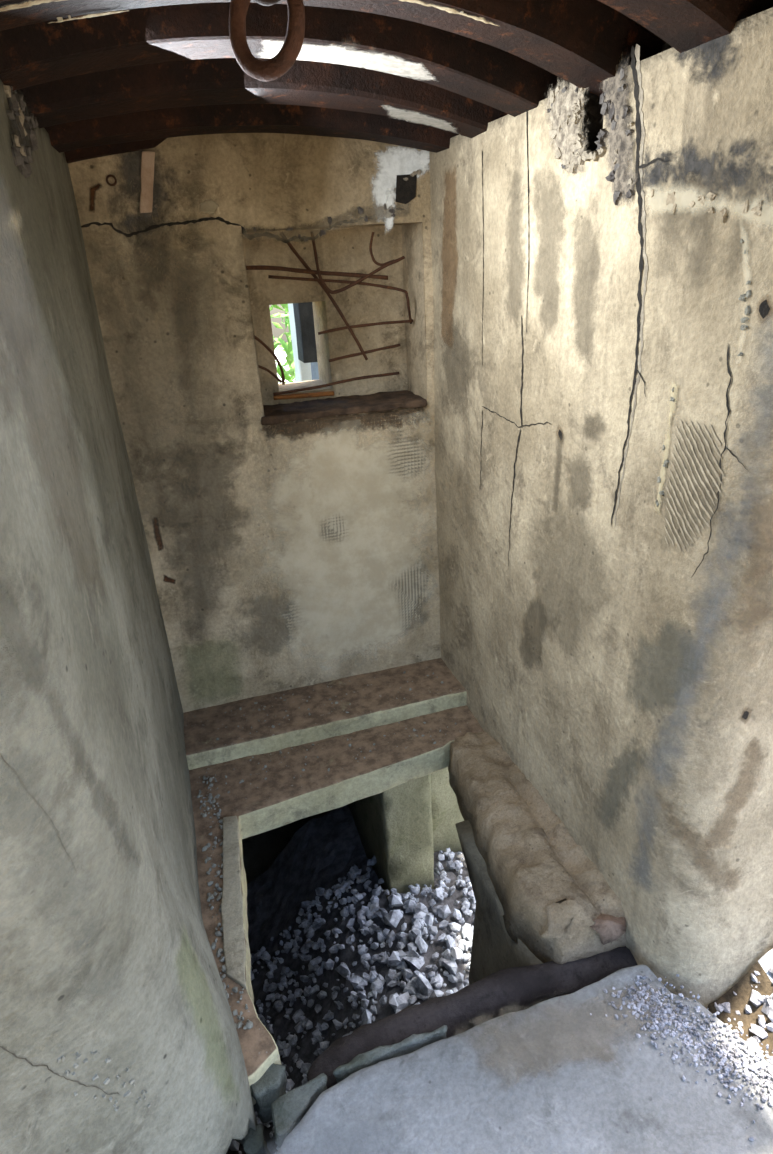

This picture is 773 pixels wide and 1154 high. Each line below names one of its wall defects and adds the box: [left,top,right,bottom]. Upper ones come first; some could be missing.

crack [81,217,316,243]
spalling [242,169,421,362]
spalling [547,53,637,206]
crack [611,44,668,527]
water stain [641,140,773,207]
spalling [254,335,400,400]
crack [691,346,746,578]
crack [0,1046,151,1112]